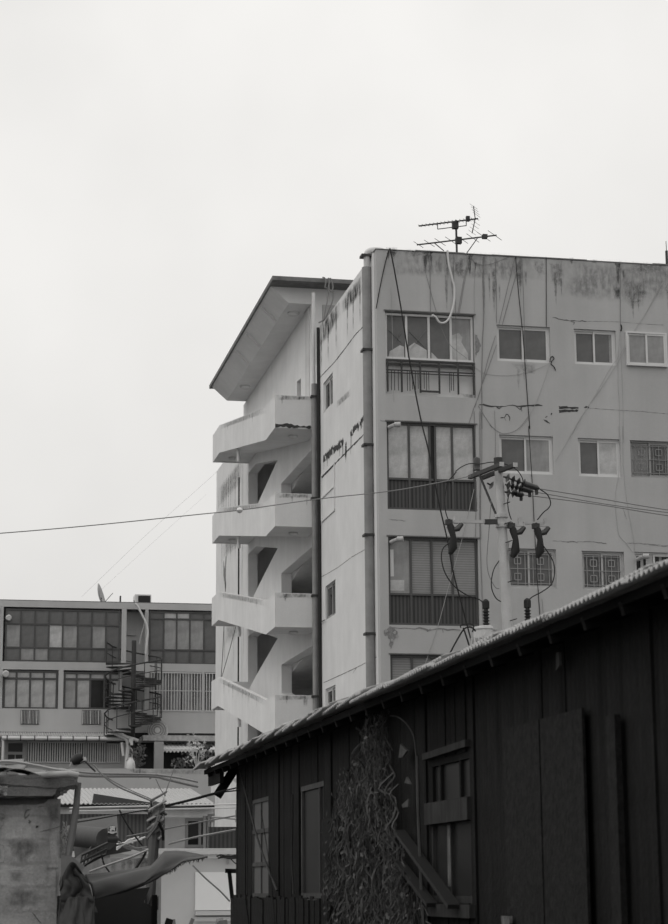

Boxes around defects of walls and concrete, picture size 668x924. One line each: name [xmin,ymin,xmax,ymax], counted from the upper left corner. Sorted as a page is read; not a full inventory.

damp [321,286,360,347]